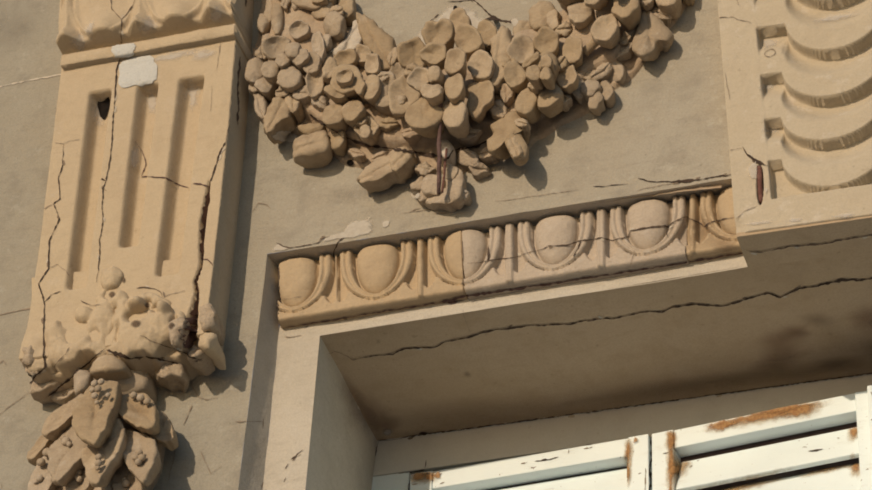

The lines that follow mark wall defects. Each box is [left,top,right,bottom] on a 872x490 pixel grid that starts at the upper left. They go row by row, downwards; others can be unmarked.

crack [430,0,516,26]
crack [309,114,511,166]
crack [0,0,241,425]
spalling [325,220,371,241]
crack [277,206,872,360]
corrosion [709,404,810,430]
corrosion [668,433,680,490]